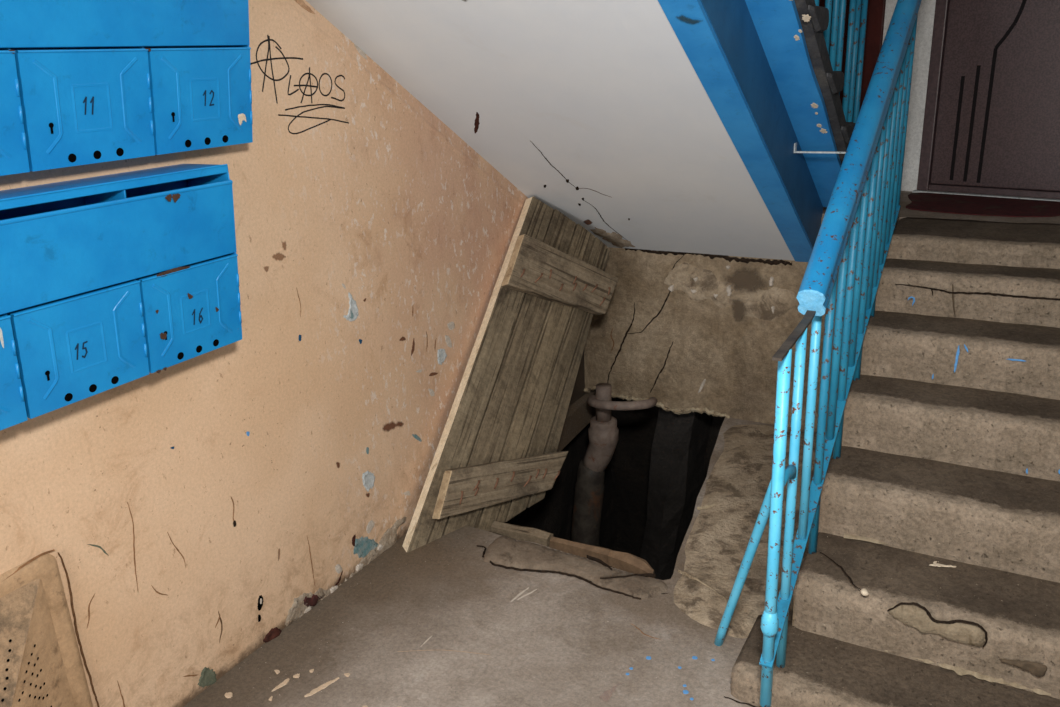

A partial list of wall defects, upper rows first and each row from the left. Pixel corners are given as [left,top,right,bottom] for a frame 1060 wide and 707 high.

crack [533,144,792,381]
spalling [664,262,797,321]
crack [896,284,1060,315]
crack [650,342,673,393]
spalling [263,517,407,643]
crack [477,545,668,600]